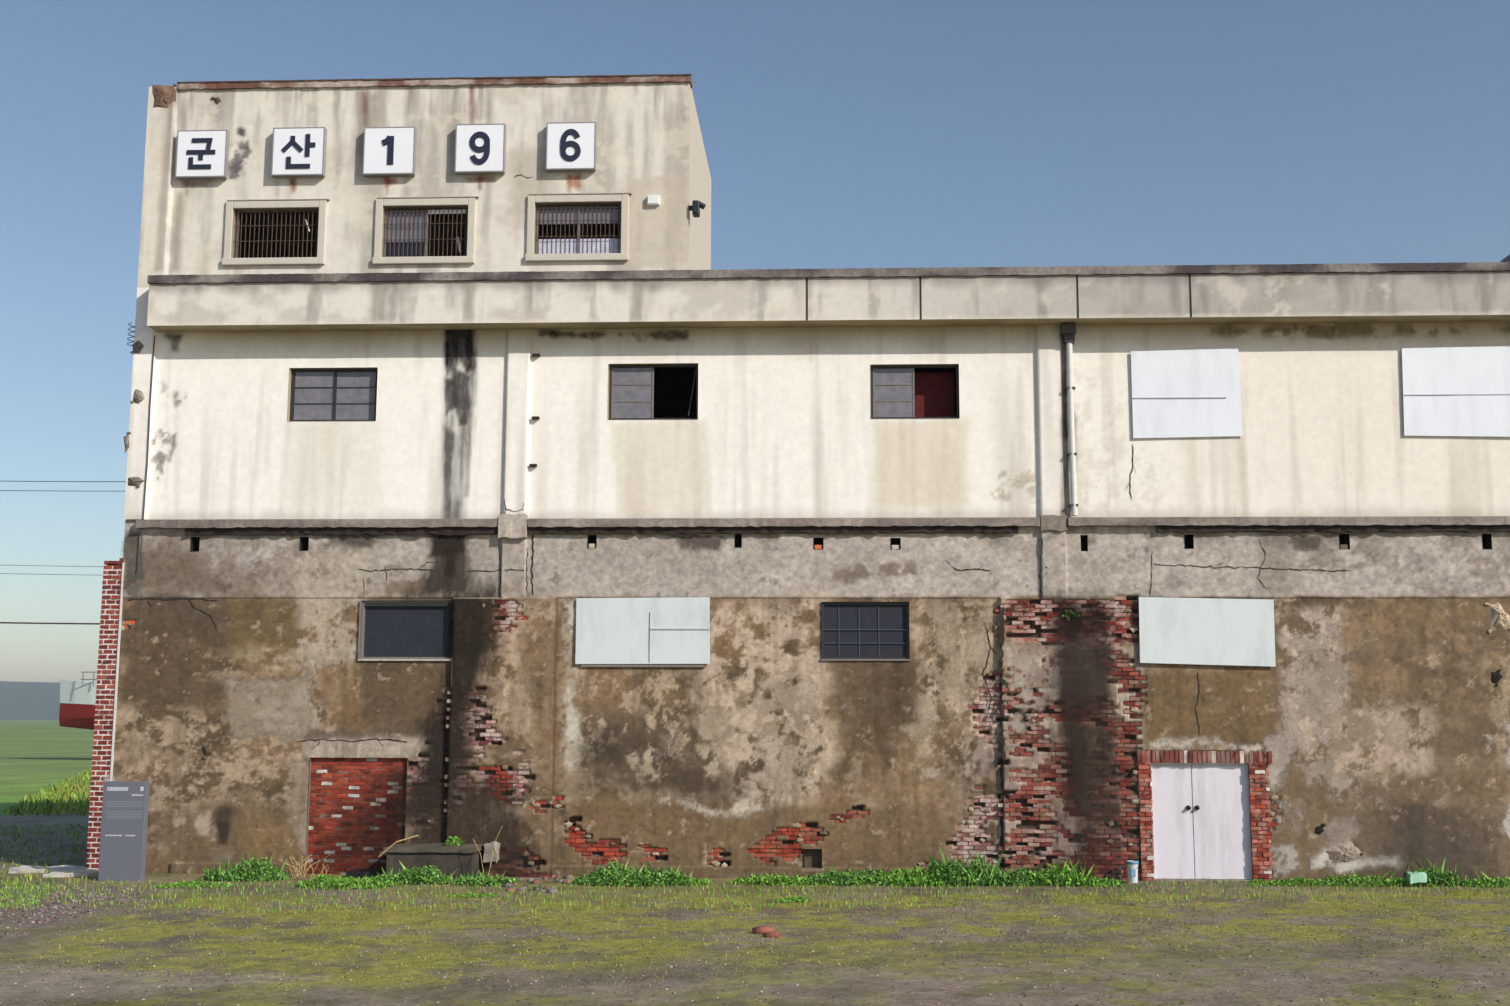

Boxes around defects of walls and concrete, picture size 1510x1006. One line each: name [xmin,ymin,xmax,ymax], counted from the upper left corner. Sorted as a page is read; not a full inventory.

damp [345,330,525,871]
flaking render [482,600,528,637]
peeling [565,597,576,634]
spalling [1491,669,1503,686]
peeling [899,713,938,741]
damp [1060,602,1114,872]
flaking render [915,596,1437,881]
peeling [1486,724,1510,766]
flaking render [406,686,667,864]
damp [216,807,231,843]
flaking render [707,848,727,867]
flaking render [748,811,869,865]